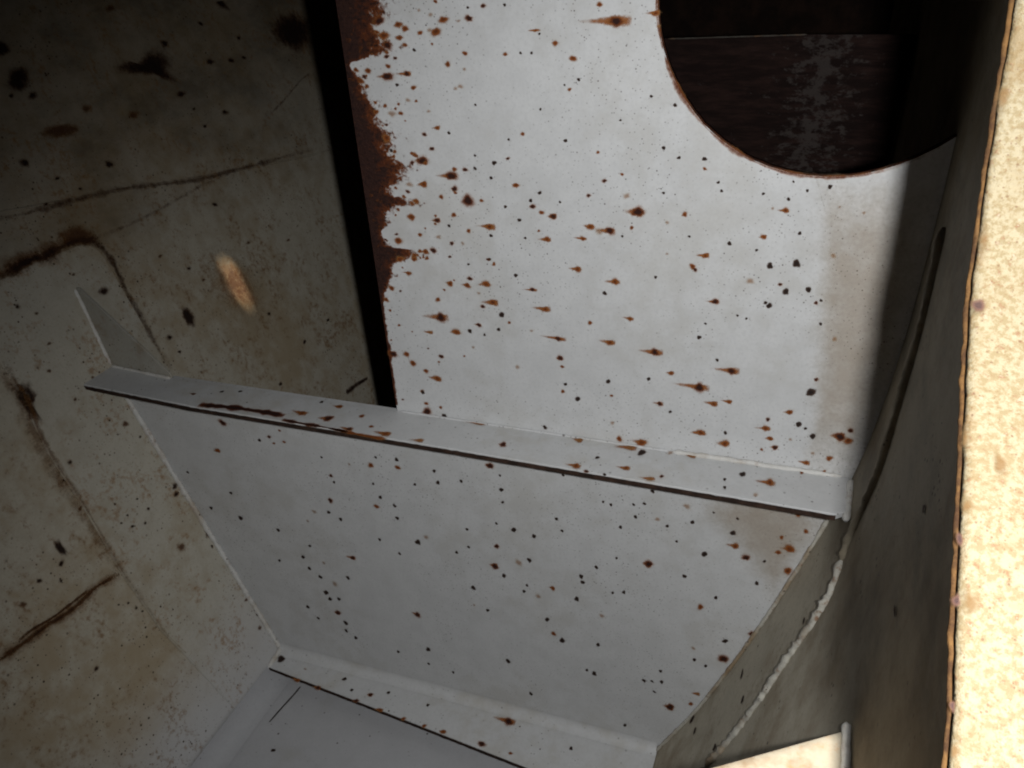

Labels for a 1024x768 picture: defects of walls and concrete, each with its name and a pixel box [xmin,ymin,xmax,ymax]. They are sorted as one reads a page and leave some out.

corrosion [359,16,448,90]
corrosion [0,227,157,346]
corrosion [397,248,436,275]
corrosion [191,393,391,444]
corrosion [617,436,647,450]
crack [0,574,119,660]